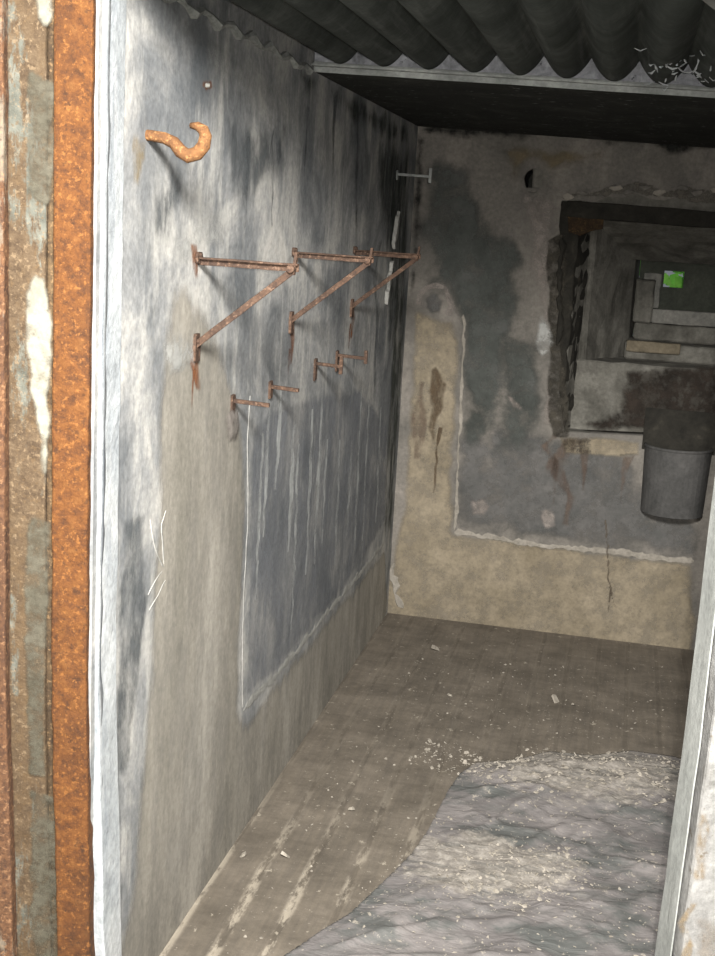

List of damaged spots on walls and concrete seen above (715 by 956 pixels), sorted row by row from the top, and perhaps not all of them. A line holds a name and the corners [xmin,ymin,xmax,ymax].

damp [157,184,178,229]
damp [232,131,281,196]
damp [166,343,193,369]
damp [423,163,695,553]
damp [250,150,408,685]
corrosion [430,369,445,483]
damp [117,519,145,746]